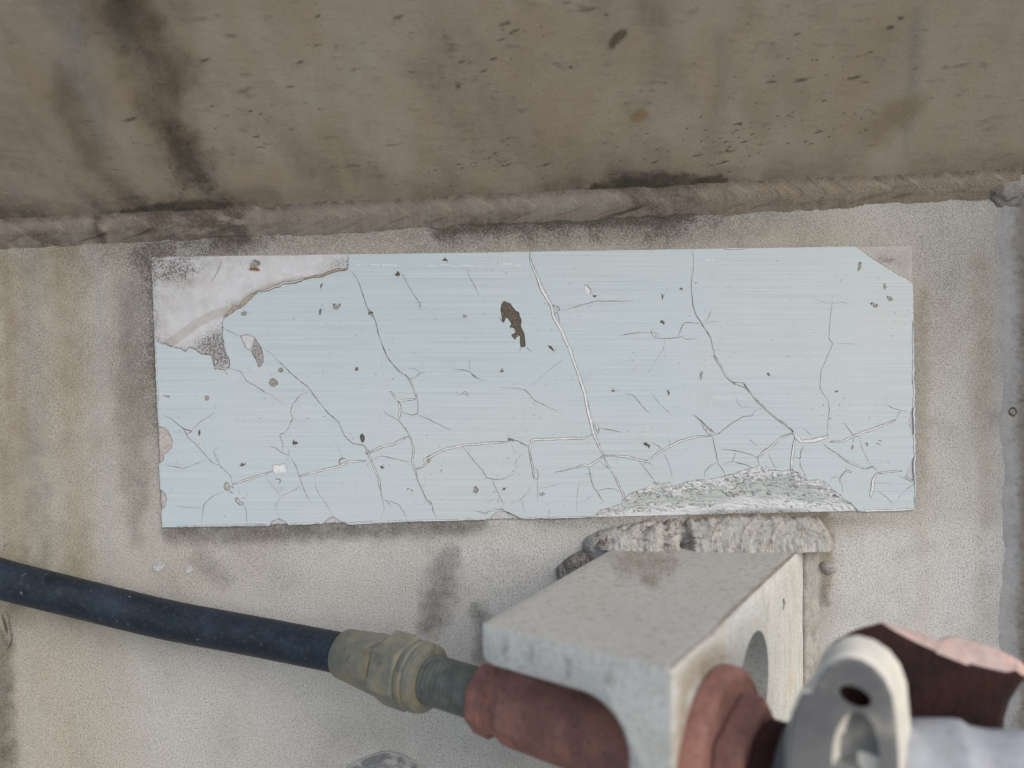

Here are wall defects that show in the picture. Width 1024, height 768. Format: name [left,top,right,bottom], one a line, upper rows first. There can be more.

peeling [151,254,351,370]
crack [164,252,915,523]
peeling [594,466,858,517]